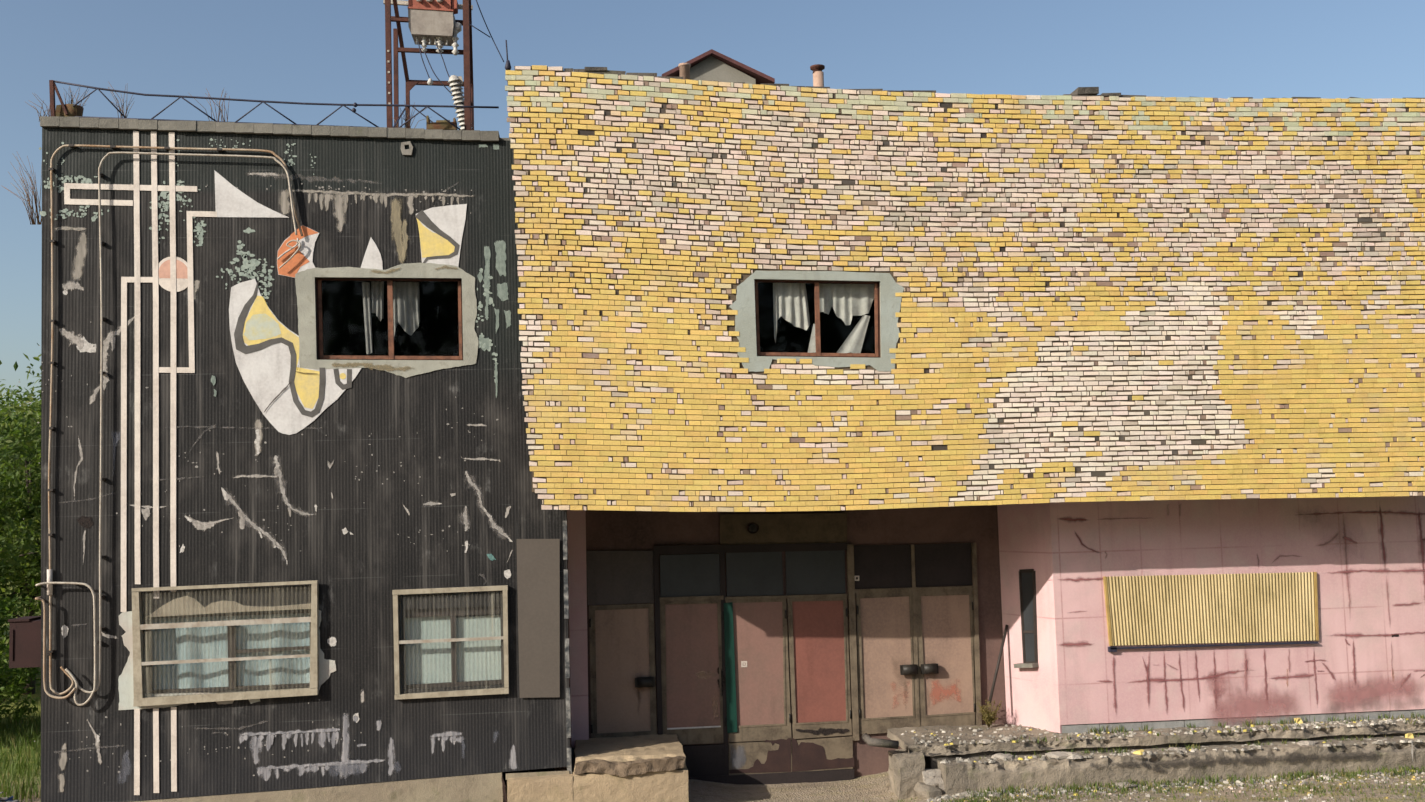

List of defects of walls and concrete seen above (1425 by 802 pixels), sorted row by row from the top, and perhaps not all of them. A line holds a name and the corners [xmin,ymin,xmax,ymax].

water stain [249,173,473,274]
spalling [116,481,232,533]
crack [1257,509,1425,683]
crack [1100,642,1356,711]
water stain [1333,681,1414,706]
peeling [729,738,854,773]